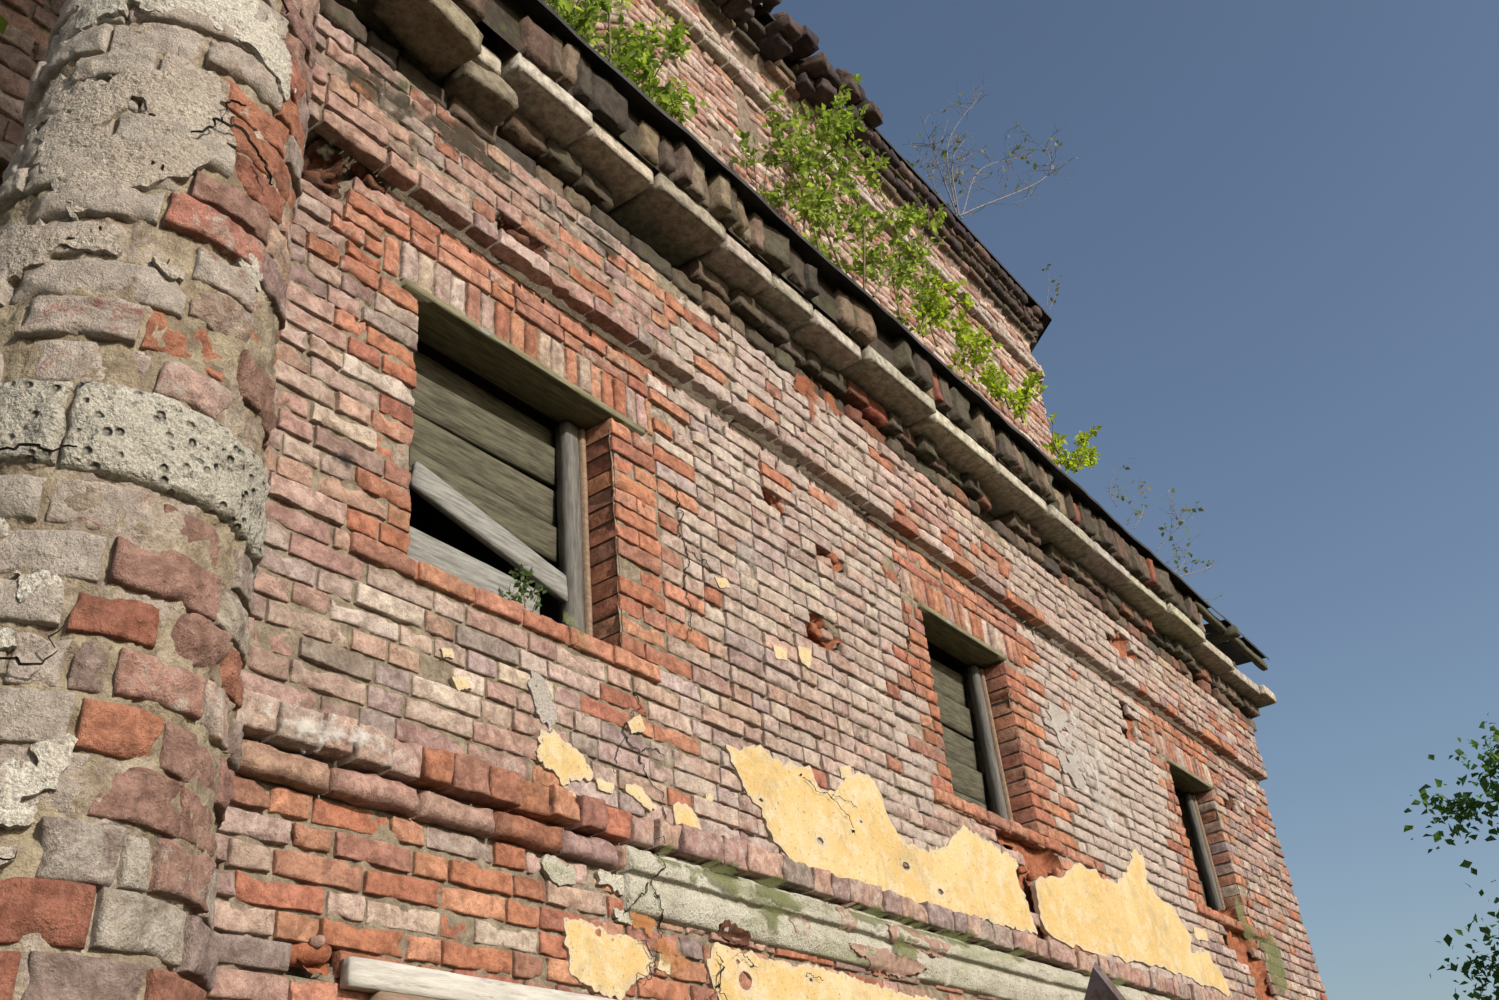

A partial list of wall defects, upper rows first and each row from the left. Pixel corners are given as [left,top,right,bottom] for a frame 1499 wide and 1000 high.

crack [190,99,273,185]
crack [0,443,77,452]
peeling [13,569,63,603]
peeling [0,626,18,652]
spalling [805,613,842,653]
peeling [0,801,39,868]
spalling [996,826,1062,940]
peeling [611,907,634,926]
flaking render [717,919,751,947]
flaking render [835,902,951,978]